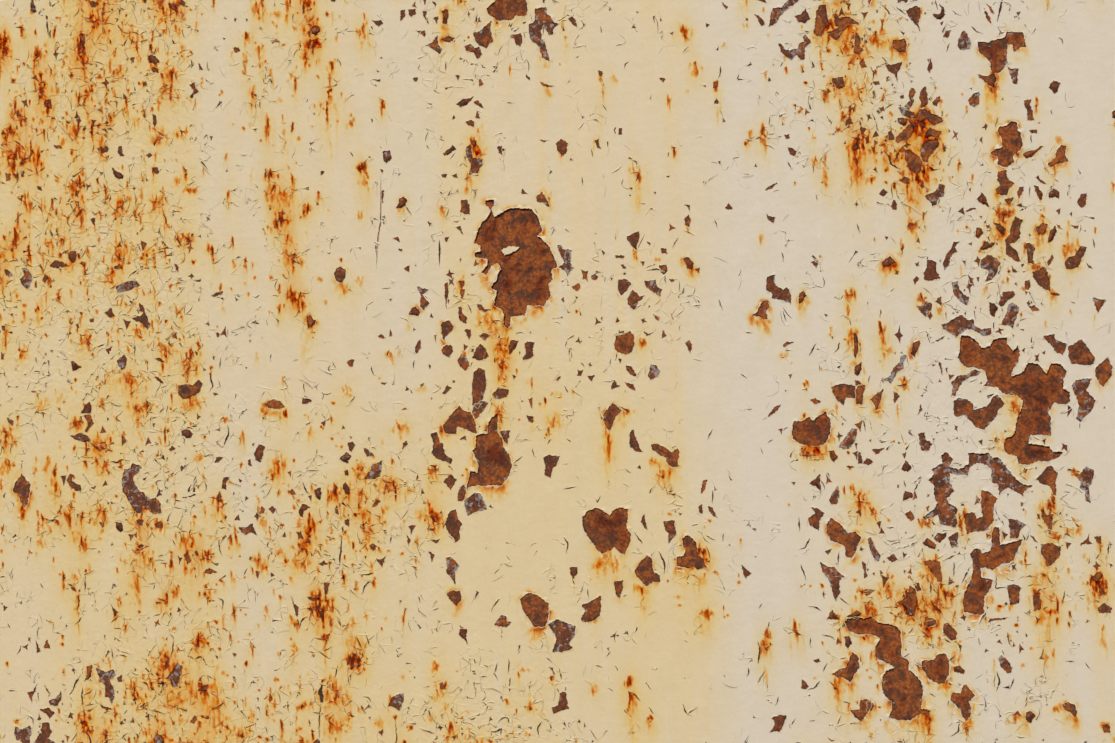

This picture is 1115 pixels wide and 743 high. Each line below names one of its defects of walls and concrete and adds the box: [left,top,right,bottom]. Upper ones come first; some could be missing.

corrosion [66,0,127,138]
peeling [895,0,1028,109]
corrosion [266,169,320,239]
corrosion [848,134,937,208]
peeling [885,58,944,184]
corrosion [271,277,306,312]
peeling [407,188,599,606]
peeling [791,99,1115,724]
corrosion [21,493,105,527]
peeling [581,505,648,557]
corrosion [311,591,334,640]
peeling [494,553,661,654]